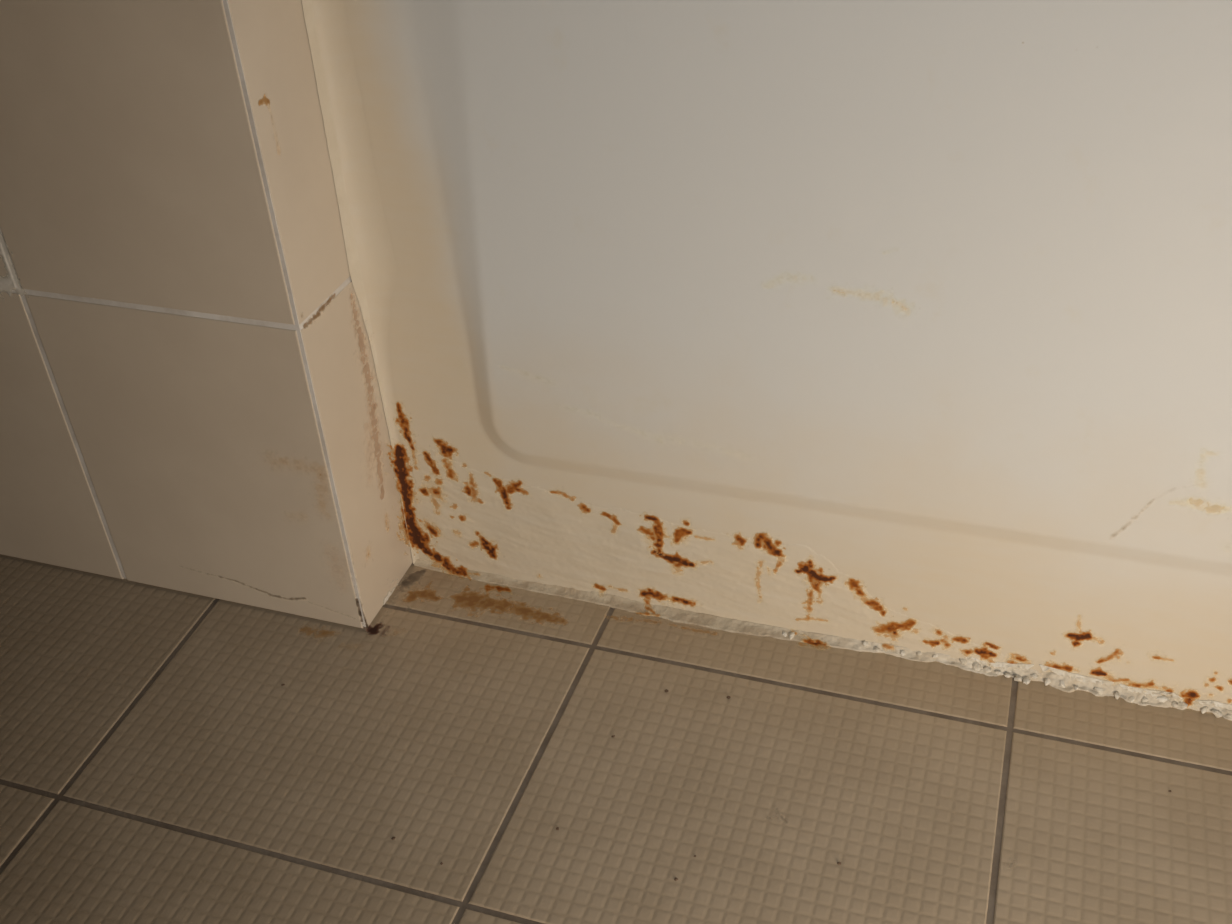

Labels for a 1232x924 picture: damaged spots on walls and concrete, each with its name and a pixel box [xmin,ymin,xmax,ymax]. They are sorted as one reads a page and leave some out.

rust [388,402,568,625]
rust [550,491,621,533]
rust [638,515,711,572]
crack [220,576,306,600]
rust [593,584,696,623]
peeling [964,655,1232,718]